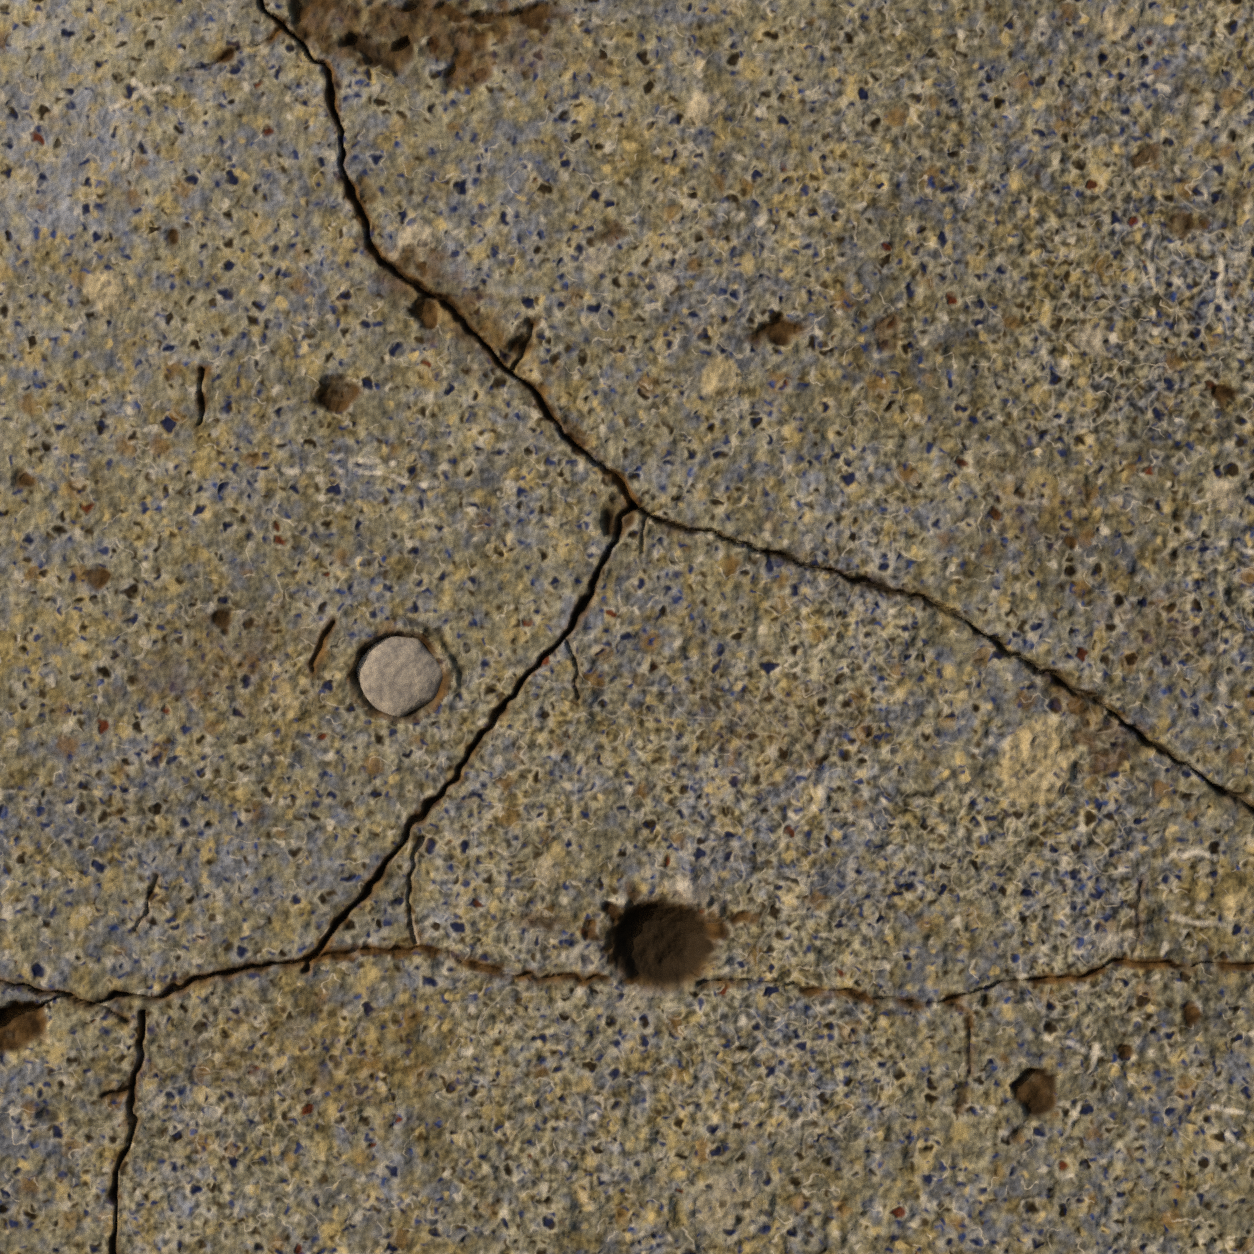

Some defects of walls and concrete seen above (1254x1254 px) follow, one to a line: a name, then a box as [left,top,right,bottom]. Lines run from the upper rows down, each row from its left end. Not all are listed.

crack [180,0,399,269]
crack [0,314,1254,1254]
peeling [598,970,677,1003]
spalling [0,999,53,1057]
spalling [1010,1066,1060,1124]